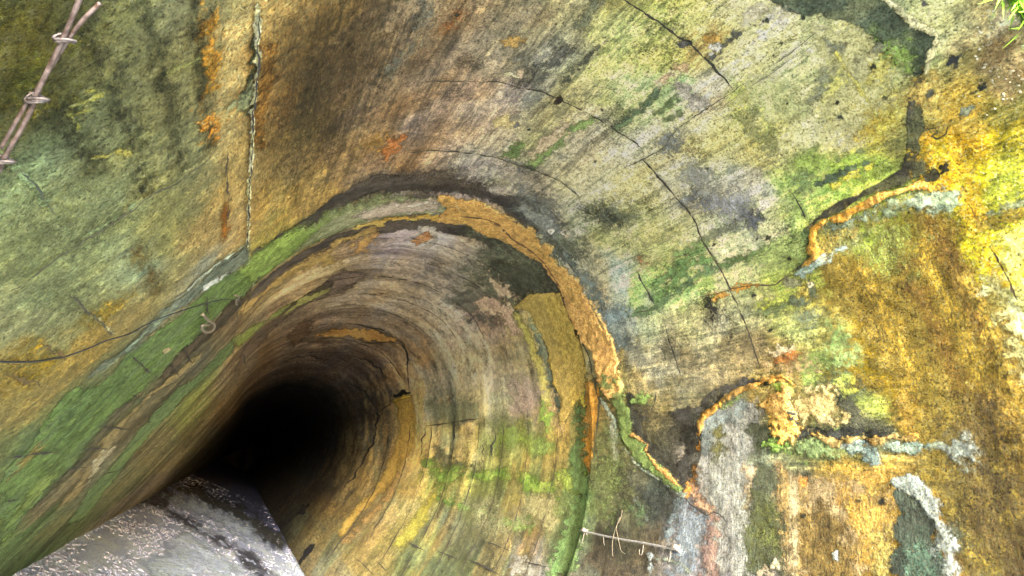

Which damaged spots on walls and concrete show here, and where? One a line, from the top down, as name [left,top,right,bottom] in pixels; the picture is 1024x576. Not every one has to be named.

crack [7,3,263,293]
corrosion [191,0,226,143]
water stain [186,0,434,208]
water stain [508,37,608,87]
water stain [574,0,606,32]
crack [409,0,878,383]
water stain [771,0,1024,576]
spalling [786,383,920,448]